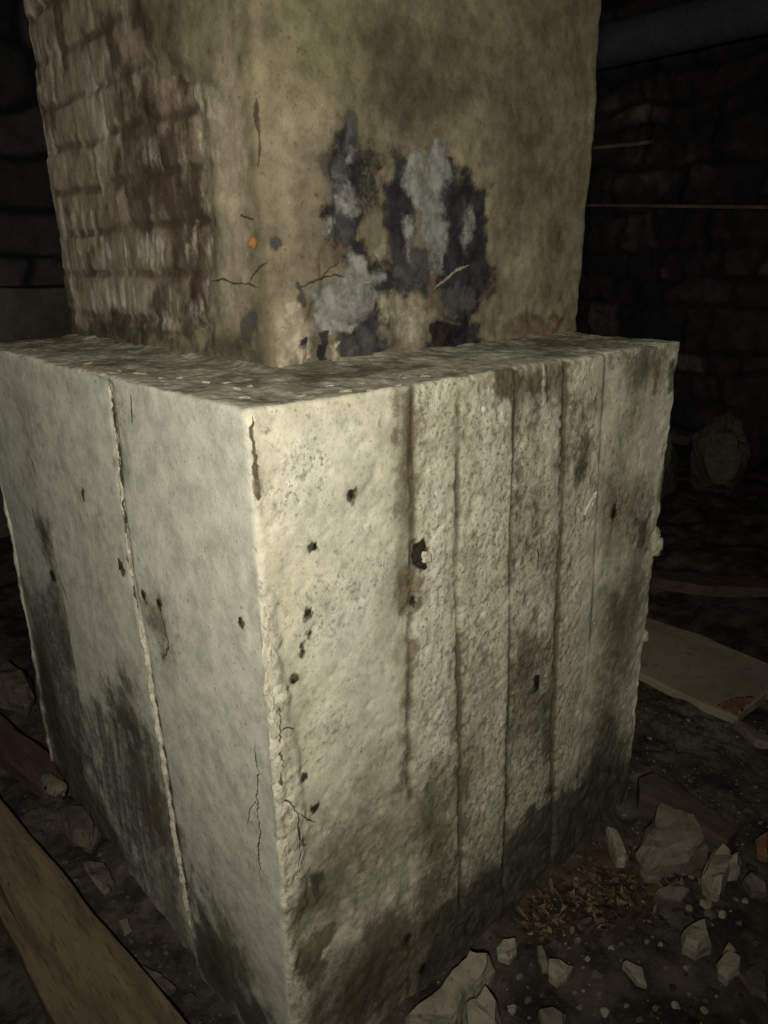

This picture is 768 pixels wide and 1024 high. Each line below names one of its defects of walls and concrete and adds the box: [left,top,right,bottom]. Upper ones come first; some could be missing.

peeling [322,182,359,237]
peeling [401,138,452,278]
peeling [461,209,475,244]
crack [211,262,268,287]
crack [302,262,344,287]
peeling [278,240,476,368]
damp [23,585,186,882]
crack [246,704,316,882]
damp [291,872,324,921]
damp [344,733,632,1024]
damp [296,922,336,990]